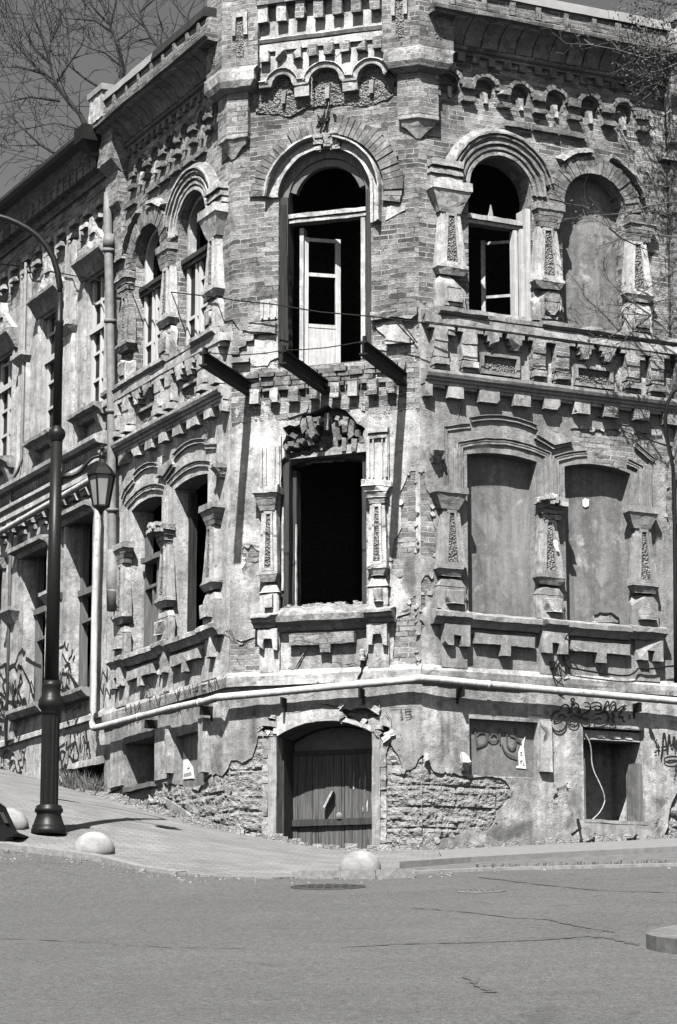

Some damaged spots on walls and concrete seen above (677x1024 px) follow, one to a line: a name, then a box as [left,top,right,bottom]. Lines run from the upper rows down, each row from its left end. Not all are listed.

spalling [350,402,368,423]
spalling [389,469,436,665]
spalling [108,714,277,837]
spalling [338,703,510,849]